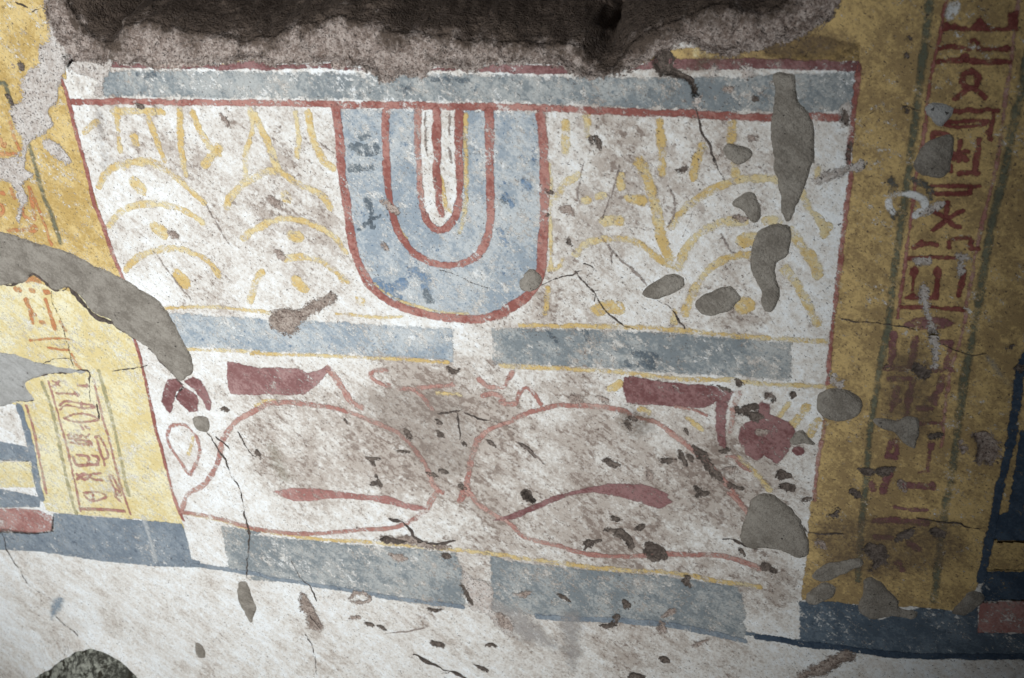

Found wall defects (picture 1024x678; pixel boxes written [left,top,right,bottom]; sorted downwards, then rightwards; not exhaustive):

flaking render [0,0,841,223]
crack [696,109,724,179]
flaking render [268,291,338,338]
crack [542,263,634,330]
crack [207,431,255,578]